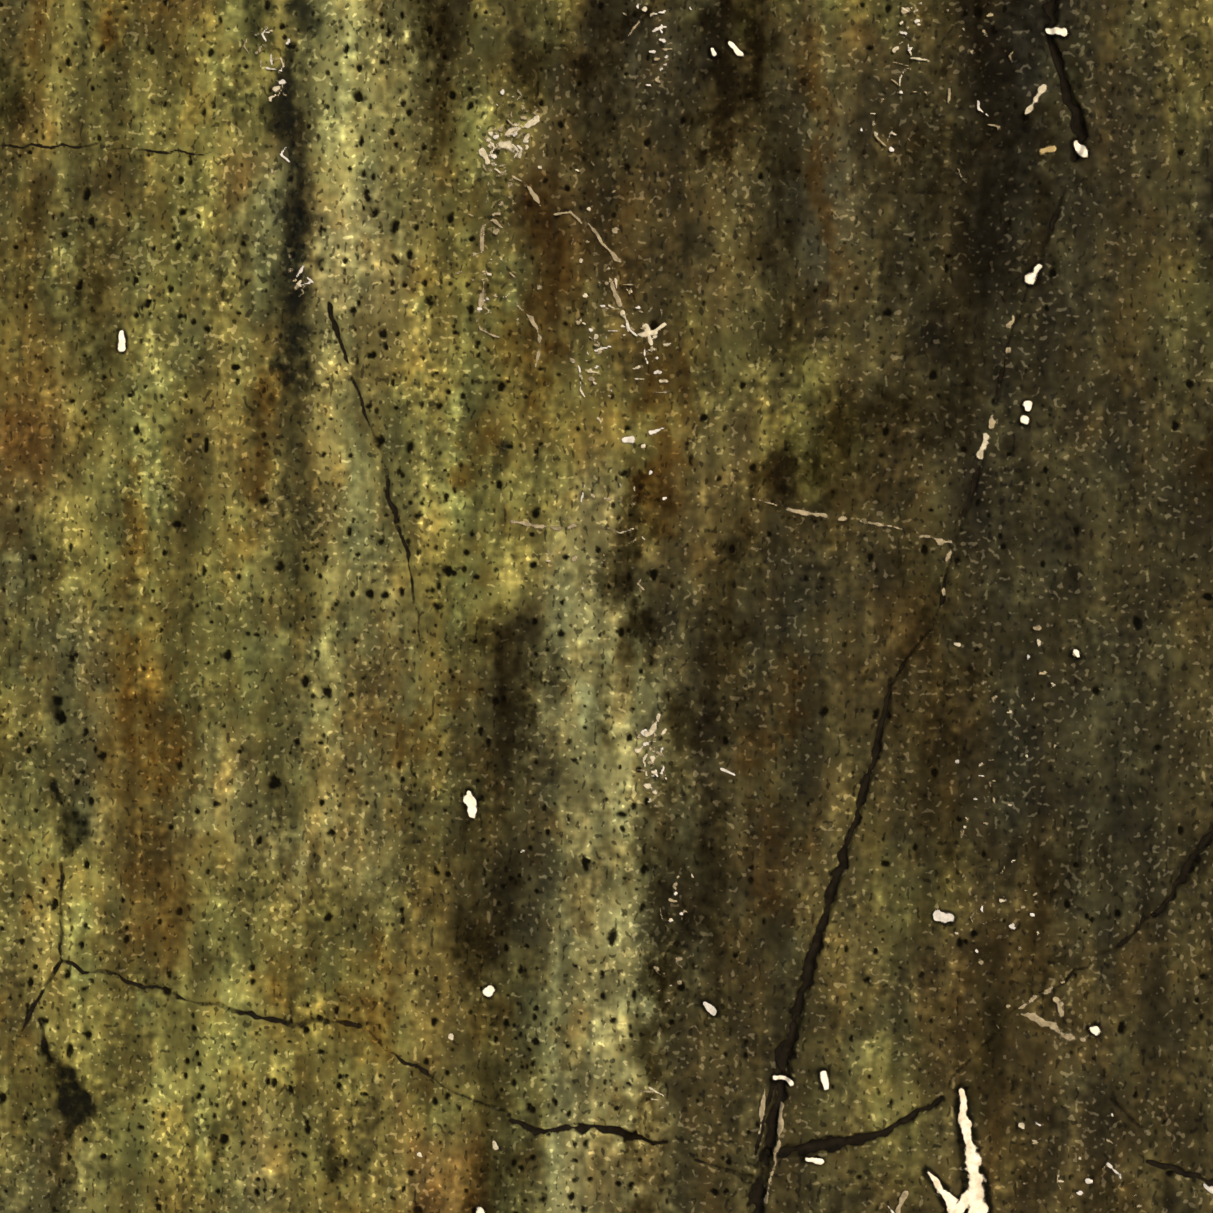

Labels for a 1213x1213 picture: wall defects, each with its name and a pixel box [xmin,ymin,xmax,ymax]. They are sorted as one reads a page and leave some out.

crack [2,143,203,156]
crack [1042,0,1088,162]
crack [1039,197,1063,265]
crack [995,297,1025,396]
crack [327,302,421,642]
crack [694,459,991,1213]
crack [1039,827,1213,993]
crack [22,863,668,1146]
leakage [54,1065,95,1130]
crack [1145,1160,1213,1187]